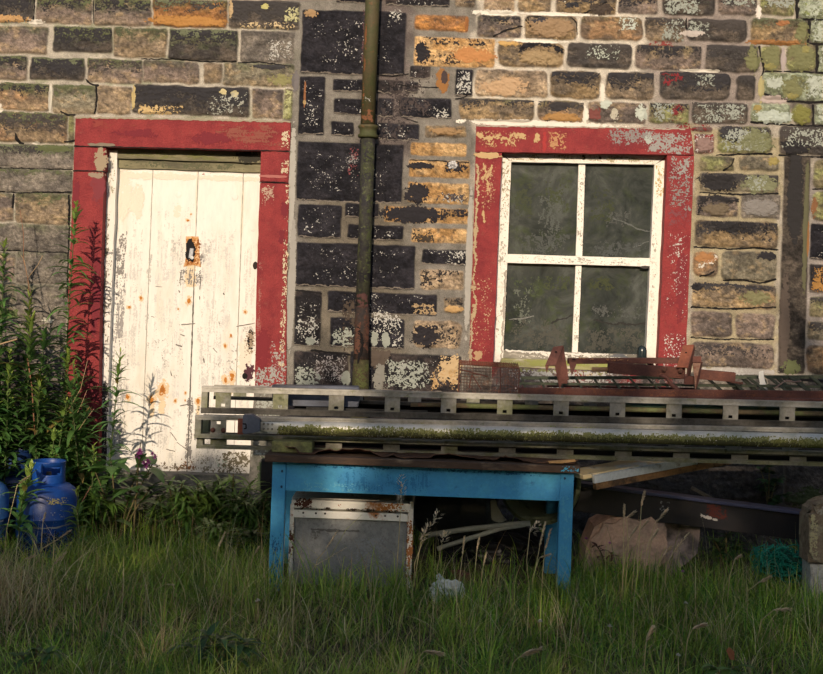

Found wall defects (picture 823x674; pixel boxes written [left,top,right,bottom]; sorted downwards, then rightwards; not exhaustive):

rust [146,378,201,418]
peeling [91,207,264,473]
peeling [259,161,290,382]
peeling [412,112,690,391]